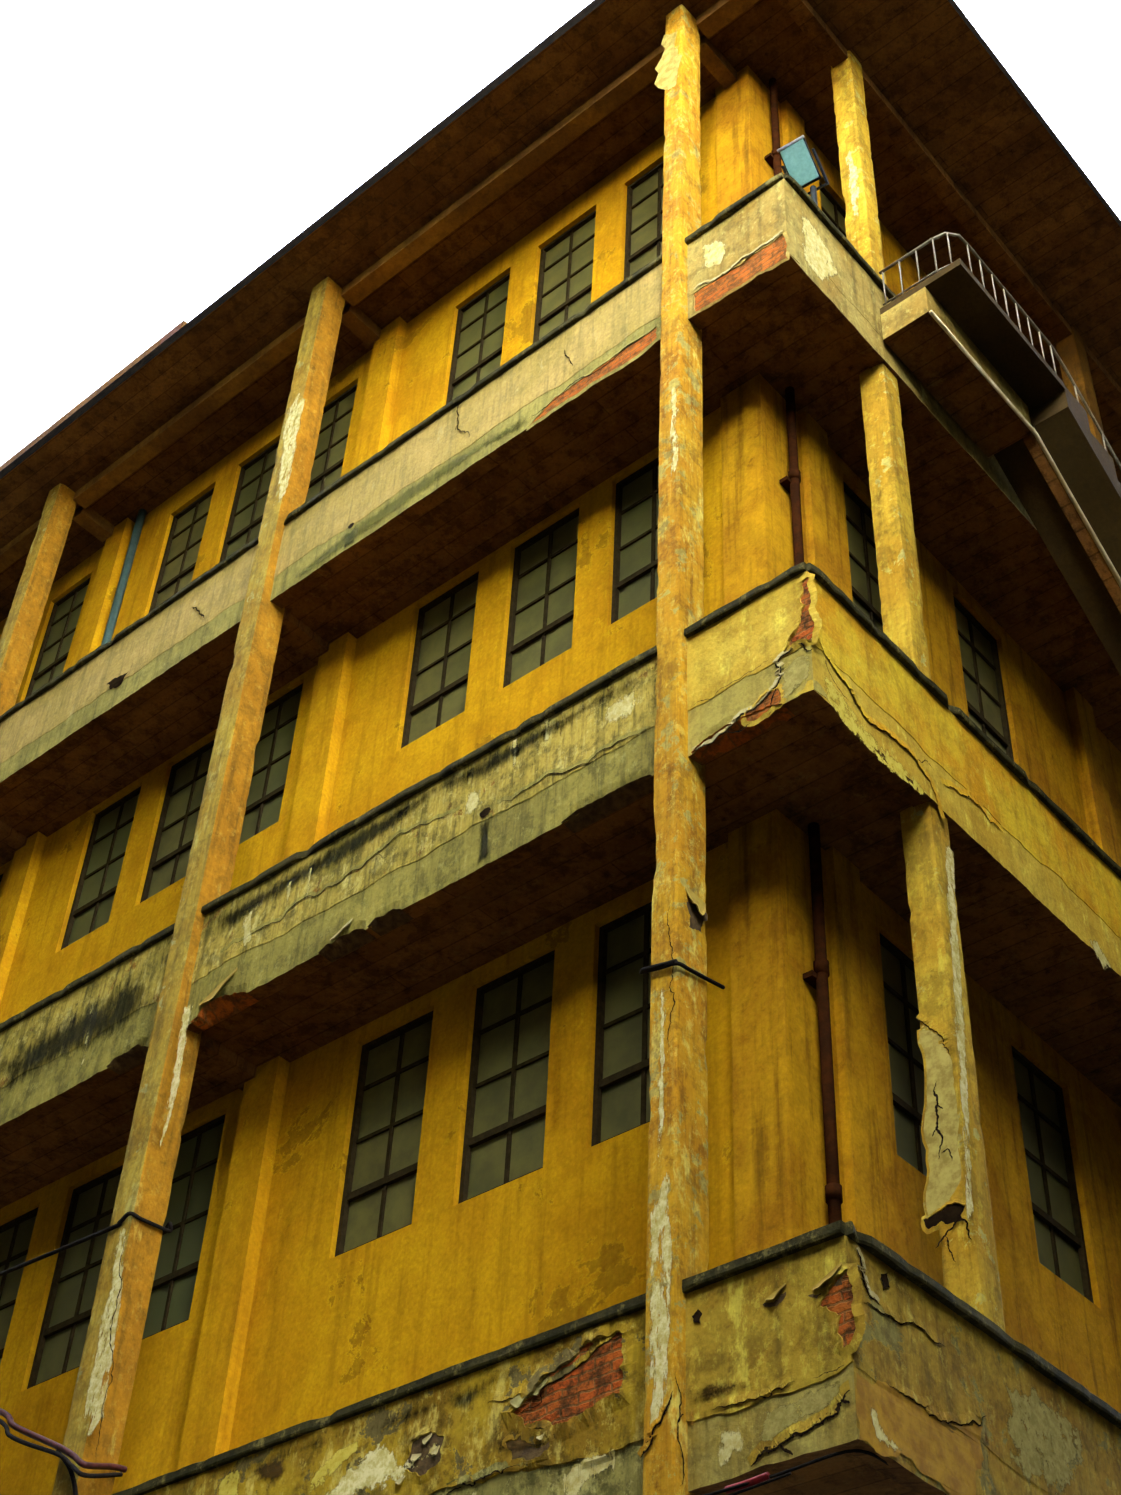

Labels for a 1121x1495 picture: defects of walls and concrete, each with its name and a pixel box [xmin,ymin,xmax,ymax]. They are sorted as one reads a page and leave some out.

peeling [655,31,682,90]
flaking render [691,233,790,314]
crack [692,637,1004,832]
spalling [318,909,414,962]
crack [916,1012,956,1159]
crack [936,1214,972,1262]
flaking render [499,1173,672,1472]
crack [856,1246,945,1346]
flaking render [309,1423,450,1495]
crack [433,1459,523,1495]
crack [637,1365,986,1484]
flaking render [761,1373,984,1495]